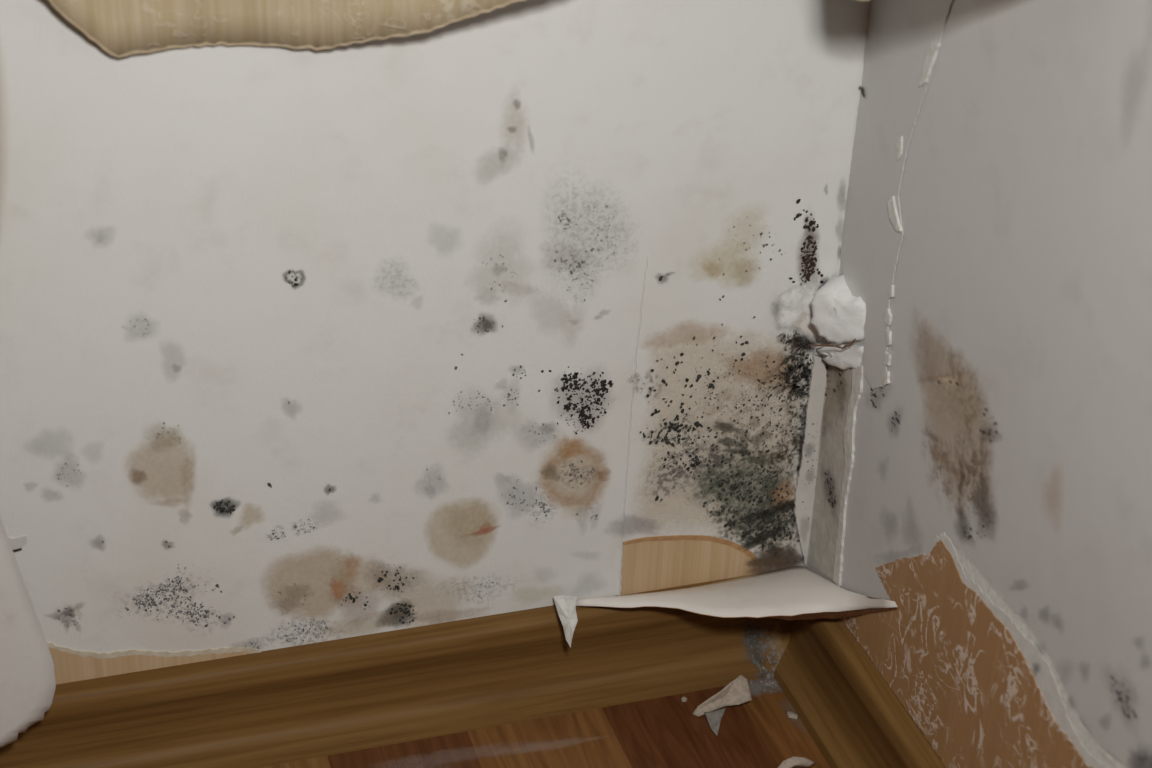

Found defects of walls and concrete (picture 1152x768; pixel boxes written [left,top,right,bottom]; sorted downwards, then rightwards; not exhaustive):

leakage [554,205,617,301]
leakage [524,366,614,445]
leakage [640,333,842,572]
leakage [125,564,235,627]